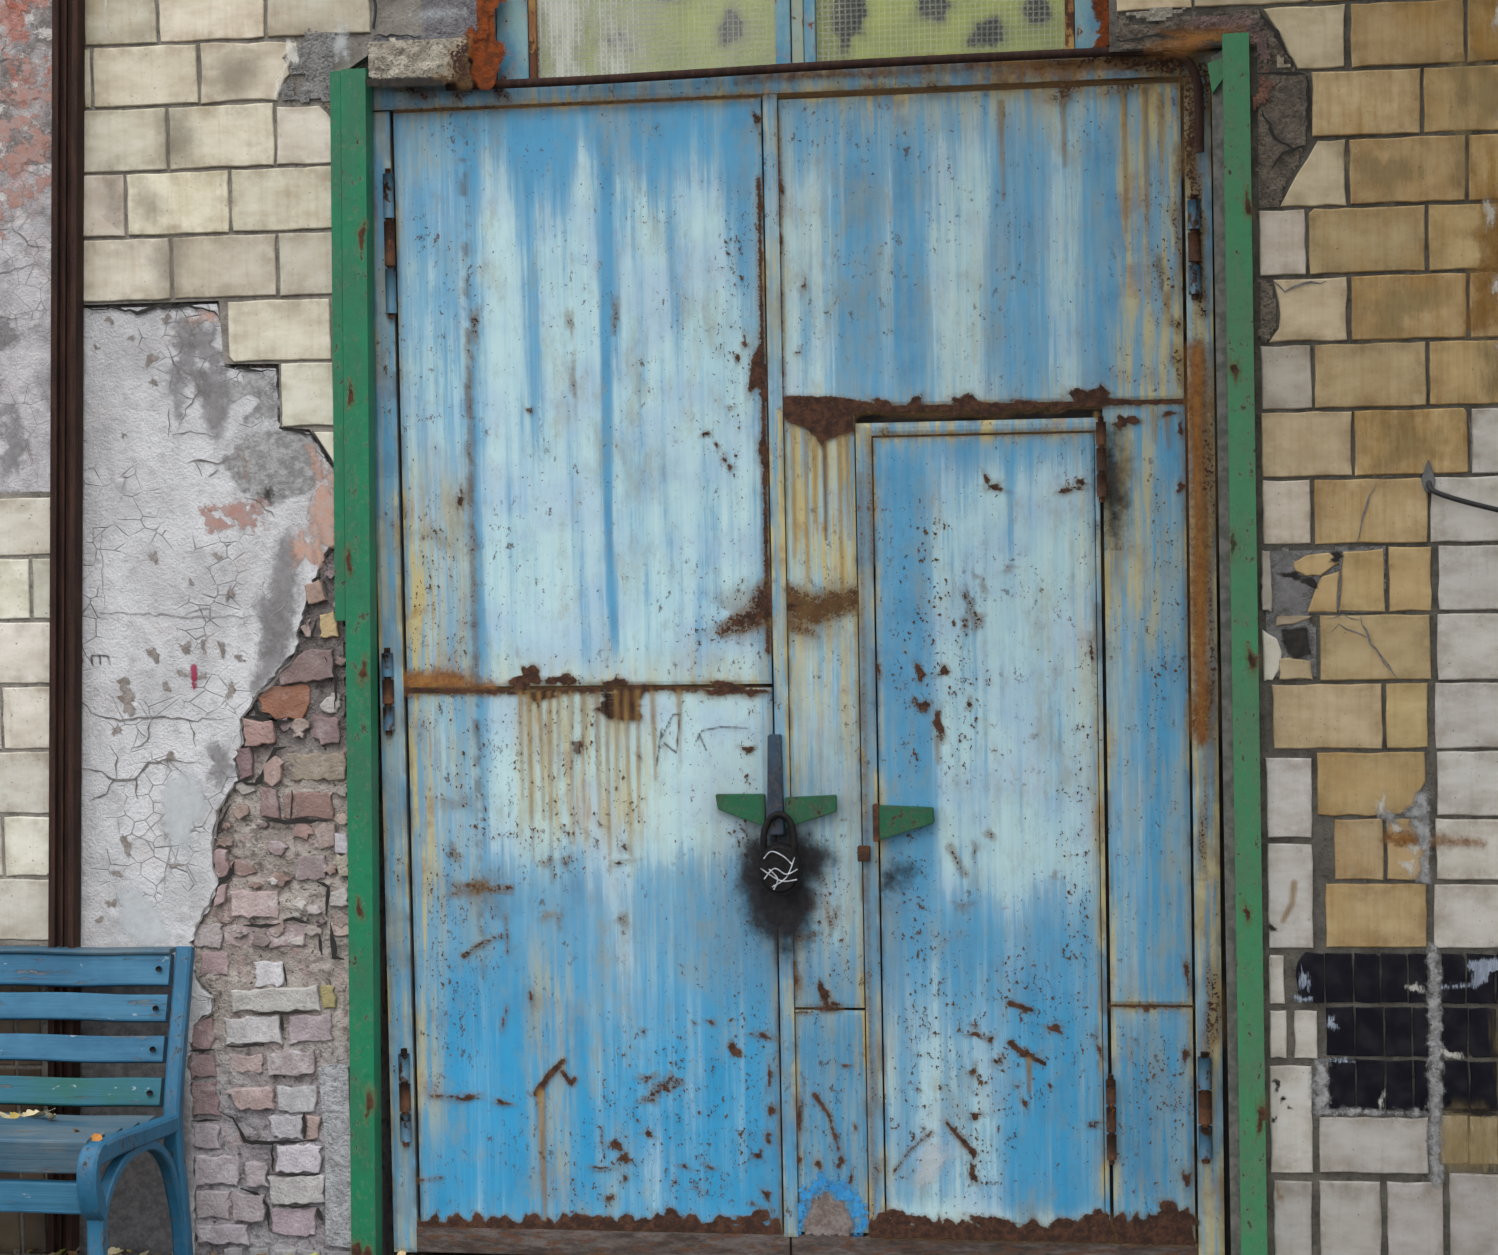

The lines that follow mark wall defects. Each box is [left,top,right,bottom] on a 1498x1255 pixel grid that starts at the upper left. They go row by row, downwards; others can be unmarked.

rust [464,0,507,90]
spalling [1116,6,1311,215]
spalling [112,677,136,736]
crack [82,524,285,619]
crack [82,654,296,937]
spalling [189,444,374,1255]
rust [385,489,655,1105]
rust [685,111,991,806]
rust [1036,0,1217,744]
spalling [1247,546,1386,680]
crack [193,995,214,1026]
peeling [1314,944,1498,1187]